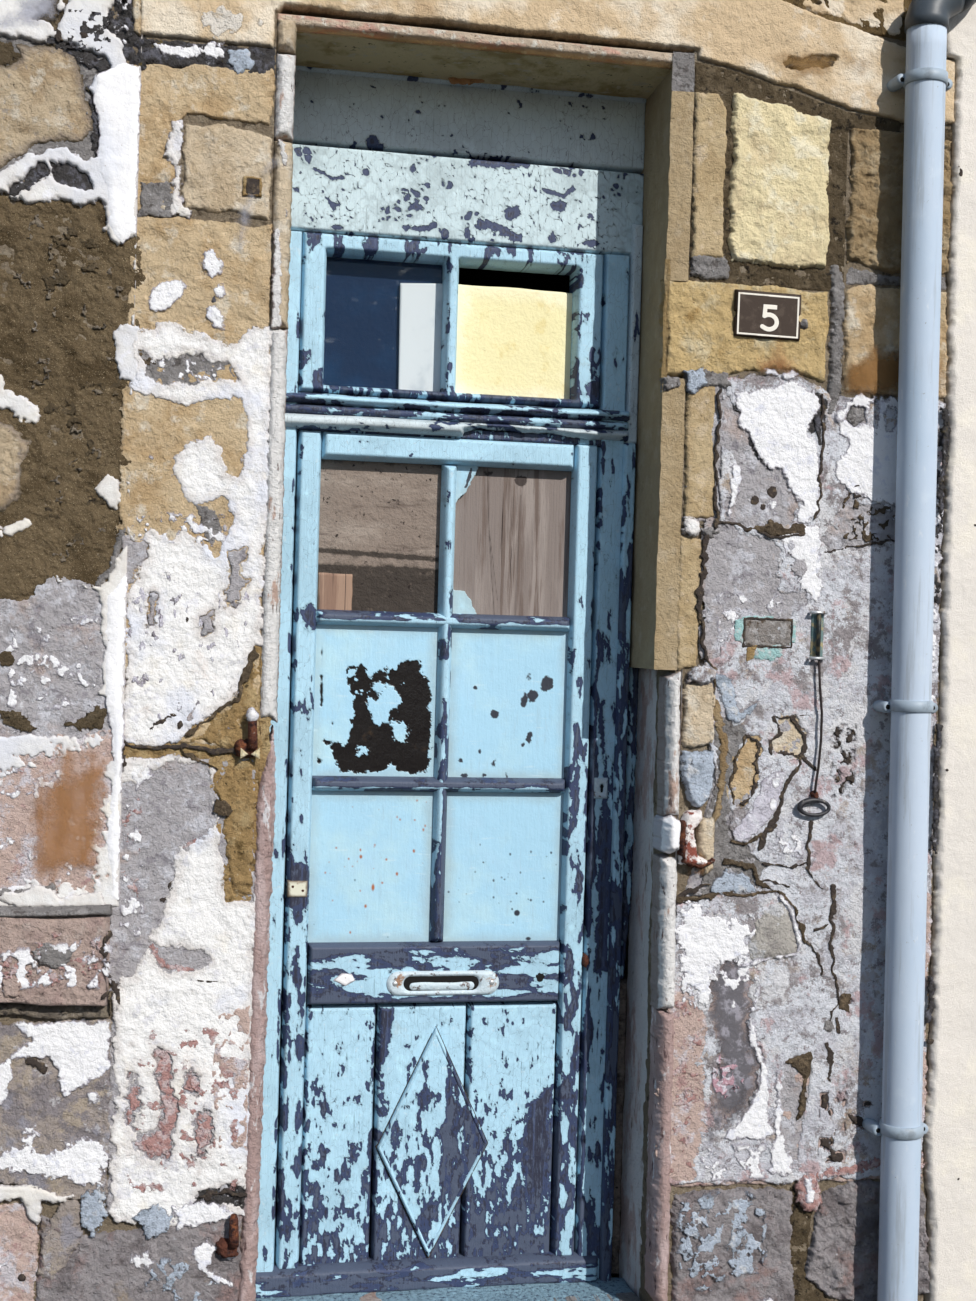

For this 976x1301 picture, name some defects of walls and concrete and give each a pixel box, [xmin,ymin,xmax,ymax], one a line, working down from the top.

spalling [0,0,272,998]
peeling [126,1005,252,1301]
crack [676,752,841,1021]
peeling [654,368,898,1292]